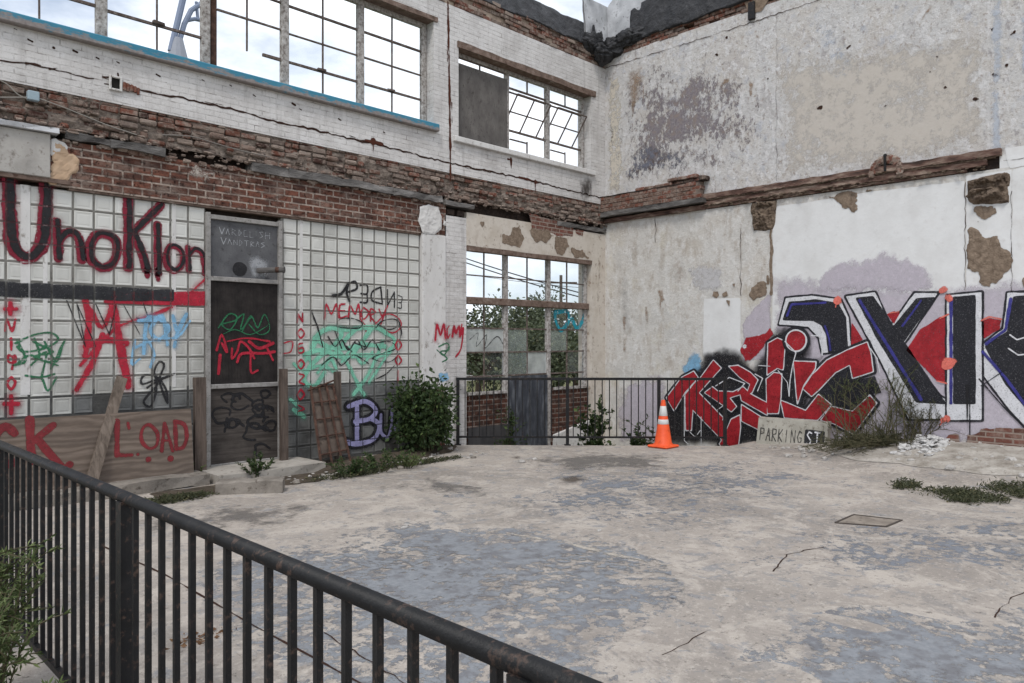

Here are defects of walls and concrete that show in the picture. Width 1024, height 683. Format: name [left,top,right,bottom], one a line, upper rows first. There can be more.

crack [0,60,107,79]
spalling [0,61,608,259]
spalling [829,189,872,212]
spalling [966,206,1013,287]